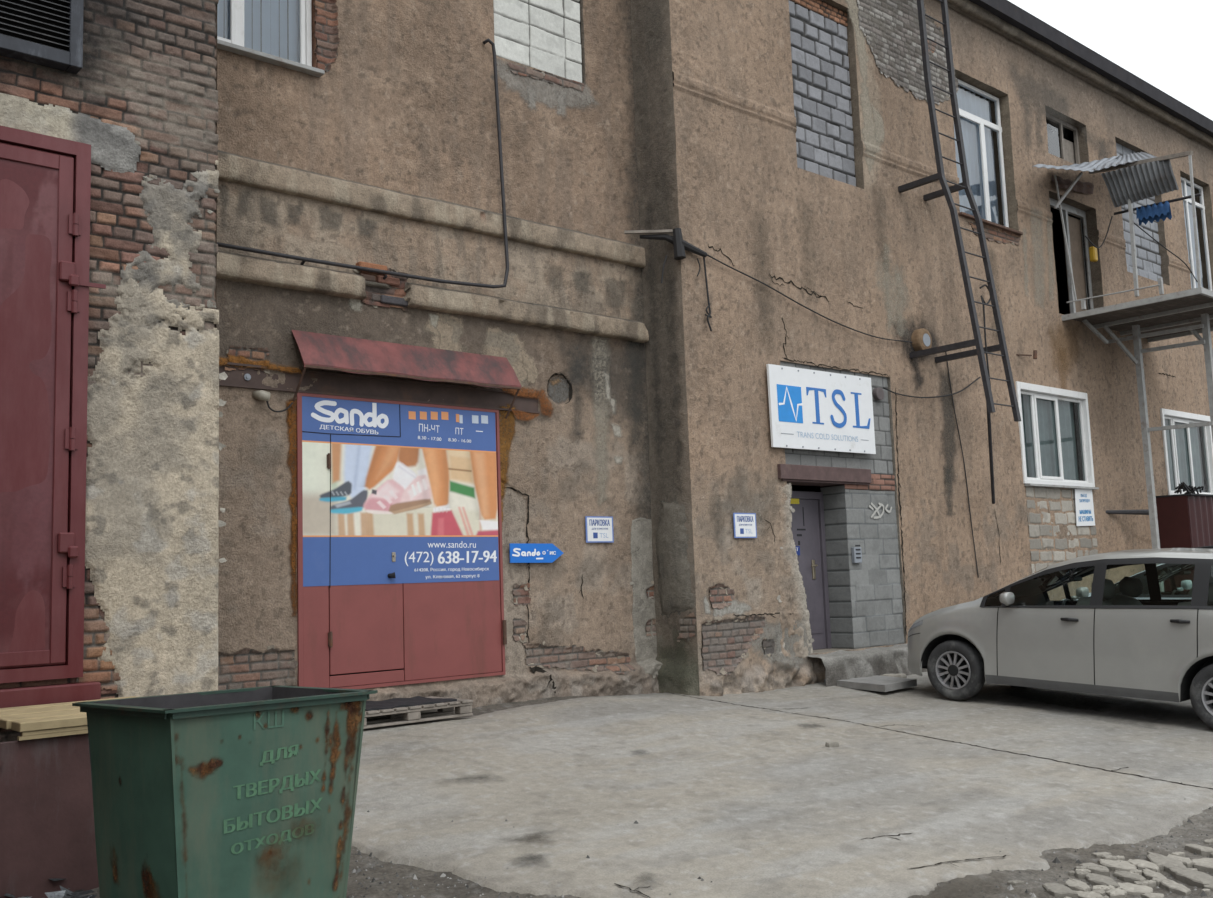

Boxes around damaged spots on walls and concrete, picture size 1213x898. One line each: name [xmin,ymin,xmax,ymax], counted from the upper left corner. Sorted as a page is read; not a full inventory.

spalling [846,0,959,171]
flaking render [0,93,298,698]
corrosion [219,354,302,373]
leakage [940,376,955,515]
spalling [511,583,635,674]
spalling [677,483,814,675]